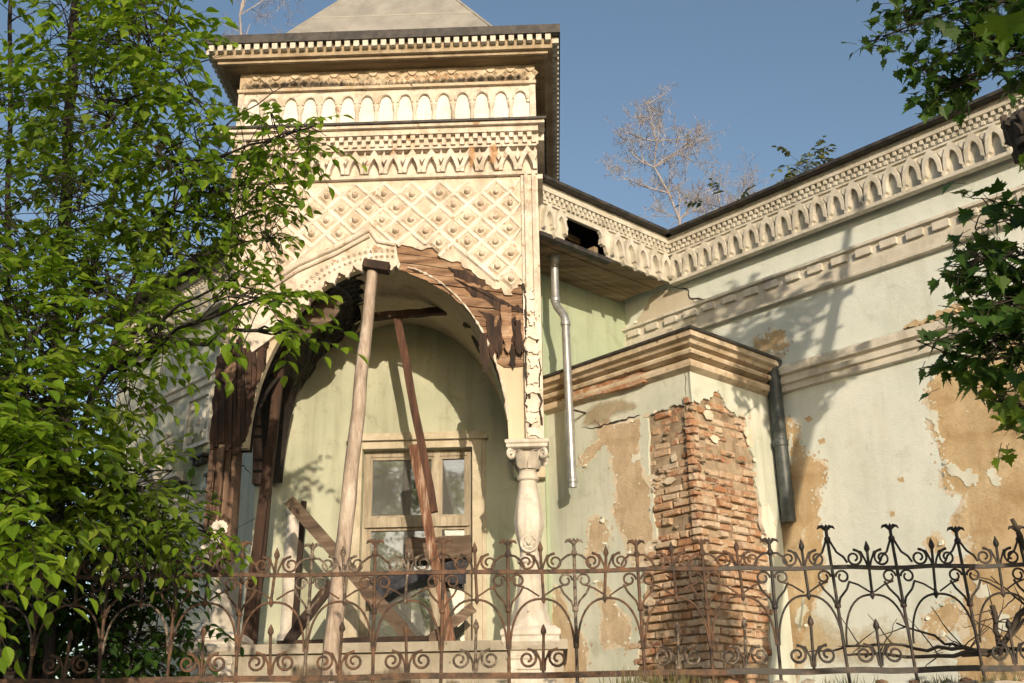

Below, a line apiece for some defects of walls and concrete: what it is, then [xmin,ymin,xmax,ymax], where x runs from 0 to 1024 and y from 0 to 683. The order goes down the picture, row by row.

flaking render [463,322,503,393]
peeling [522,283,543,439]
crack [583,415,639,429]
peeling [752,326,793,359]
flaking render [551,392,835,683]
peeling [919,341,1024,683]